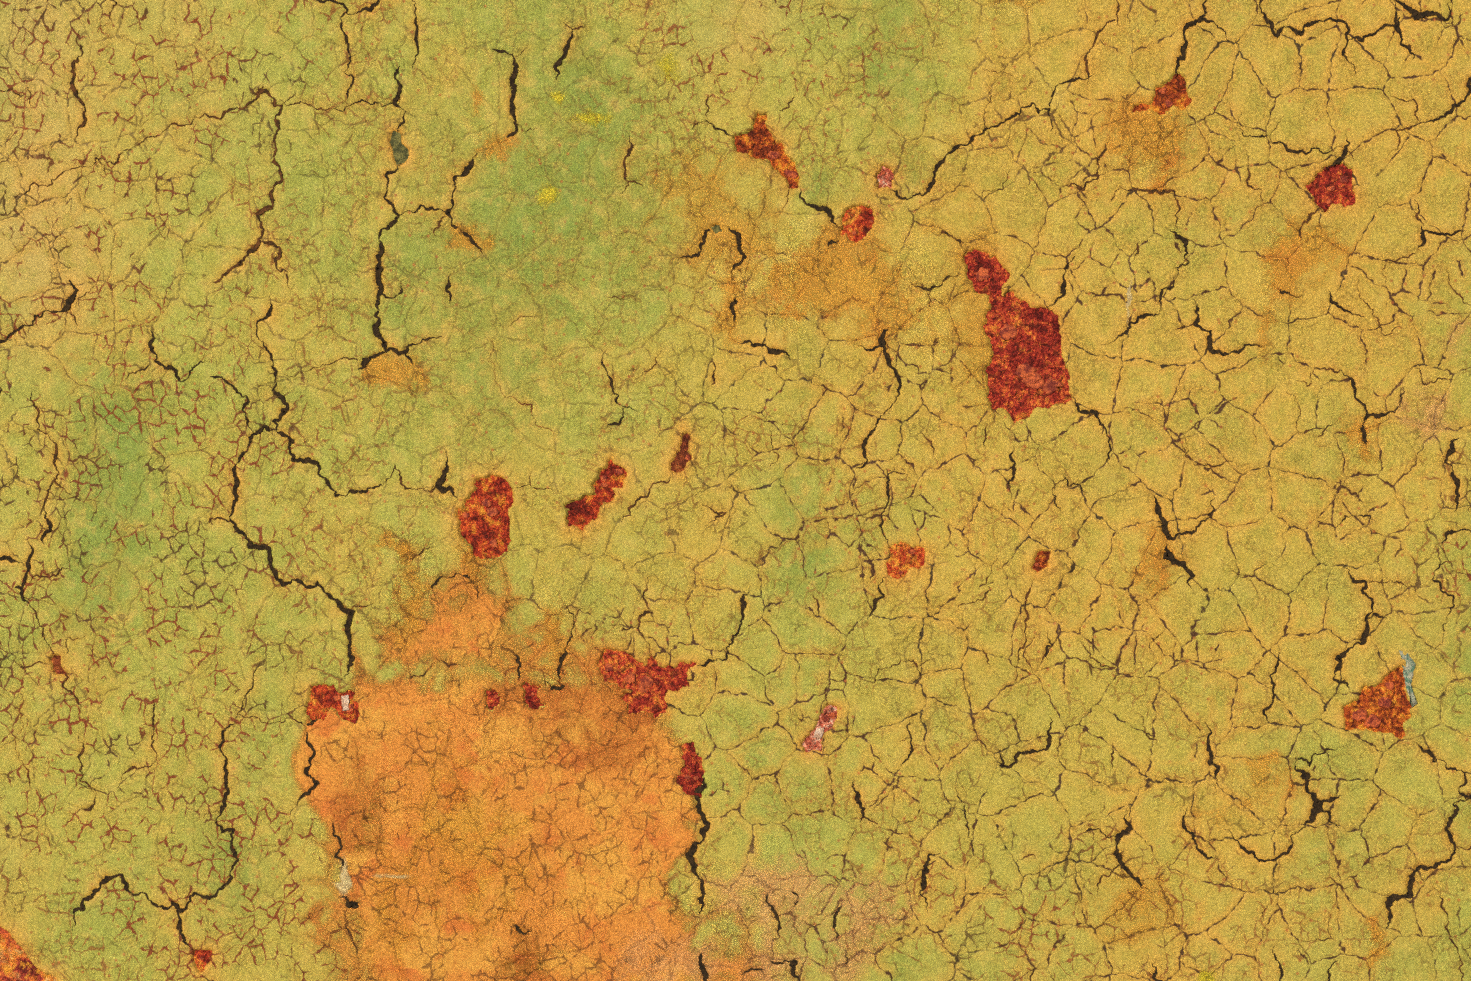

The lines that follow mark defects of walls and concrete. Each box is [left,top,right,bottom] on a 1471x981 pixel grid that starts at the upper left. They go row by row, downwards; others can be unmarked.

crack [1259,0,1452,74]
crack [14,0,583,690]
crack [853,0,1121,620]
crack [1066,132,1272,356]
crack [0,387,157,814]
crack [72,666,363,981]
rust [292,535,767,981]
crack [685,777,800,981]
peeling [802,705,837,752]
crack [1182,745,1346,862]
crack [1320,438,1471,709]
crack [1385,742,1471,981]